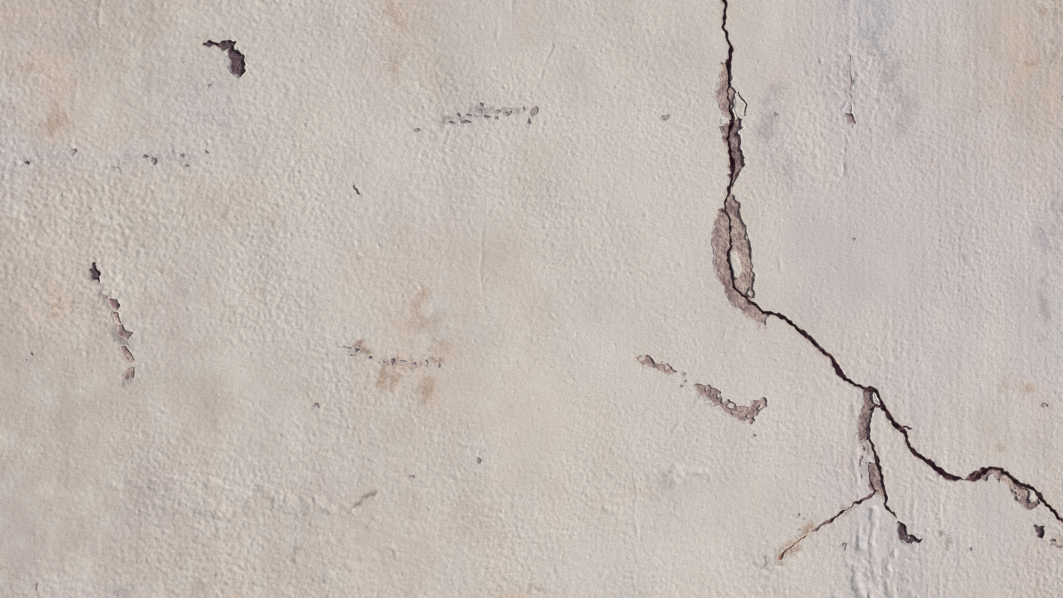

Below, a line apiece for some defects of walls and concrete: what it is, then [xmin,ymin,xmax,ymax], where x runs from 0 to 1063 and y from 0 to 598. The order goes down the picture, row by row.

peeling [203,40,246,77]
spalling [712,62,769,326]
peeling [89,262,135,380]
crack [721,0,1063,523]
peeling [635,355,767,438]
crack [778,436,897,560]